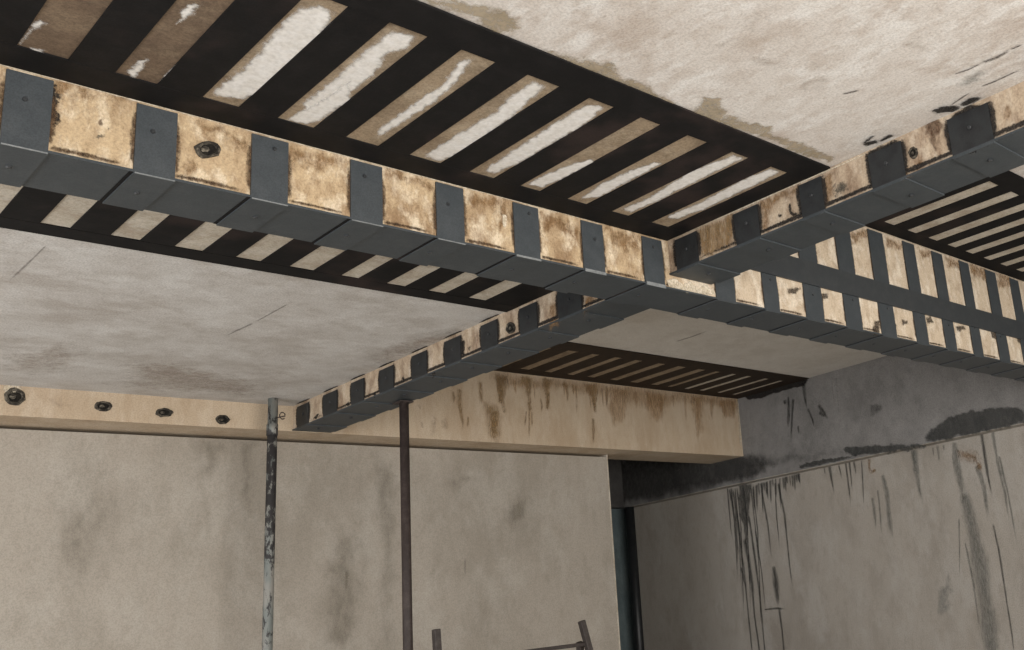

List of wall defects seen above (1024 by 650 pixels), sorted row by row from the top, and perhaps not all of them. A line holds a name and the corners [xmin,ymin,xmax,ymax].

leakage [428,0,519,33]
leakage [550,51,674,104]
leakage [694,97,832,162]
corrosion [479,375,506,437]
leakage [621,407,1024,650]